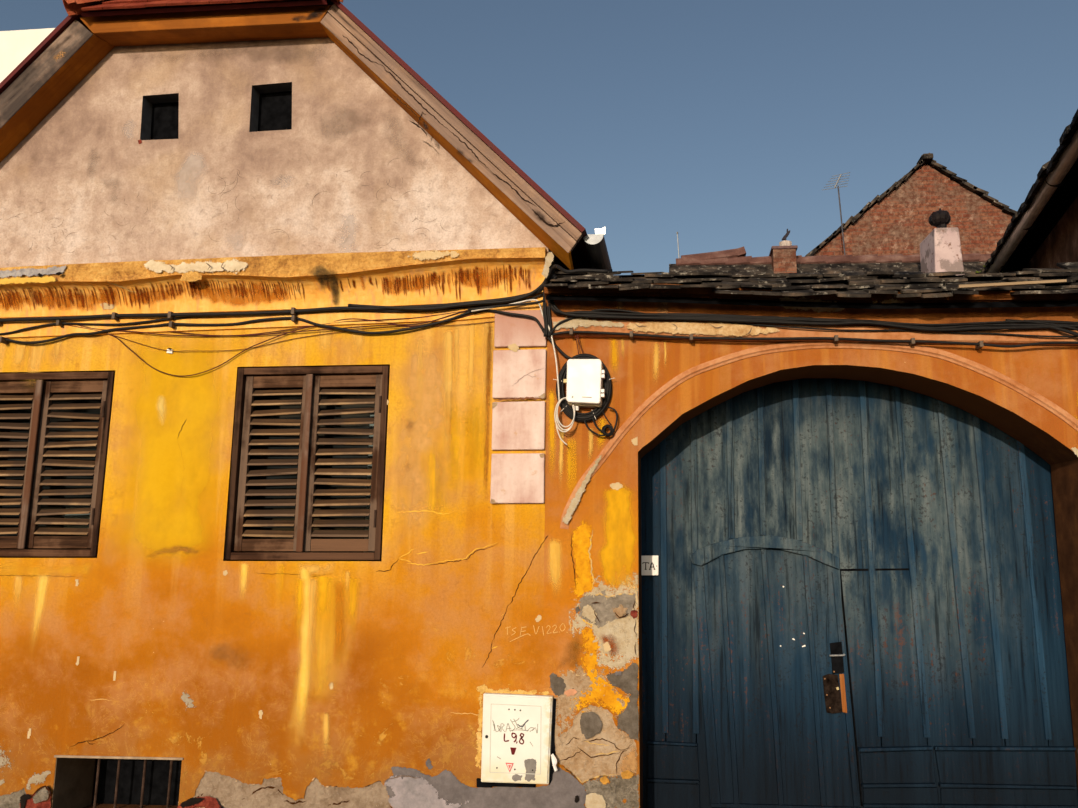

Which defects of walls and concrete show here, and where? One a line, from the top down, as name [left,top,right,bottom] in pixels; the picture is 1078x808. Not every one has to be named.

rust [0,280,304,309]
peeling [553,317,780,337]
crack [376,542,497,572]
damp [297,566,356,719]
crack [482,536,548,668]
flaking render [475,455,639,808]
flaking render [0,746,51,808]
flaking render [177,771,391,808]